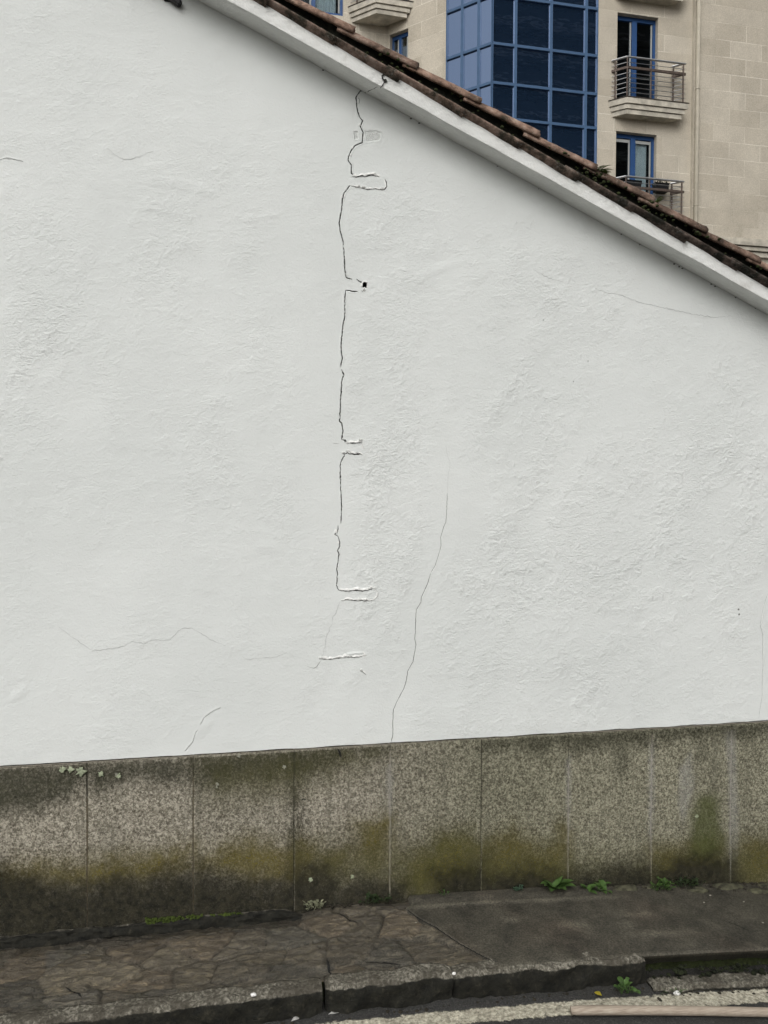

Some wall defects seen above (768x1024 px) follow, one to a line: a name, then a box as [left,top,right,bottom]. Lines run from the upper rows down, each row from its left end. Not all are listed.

crack [310,74,387,668]
crack [391,448,450,742]
crack [184,707,221,751]
damp [0,831,405,936]
damp [434,856,741,894]